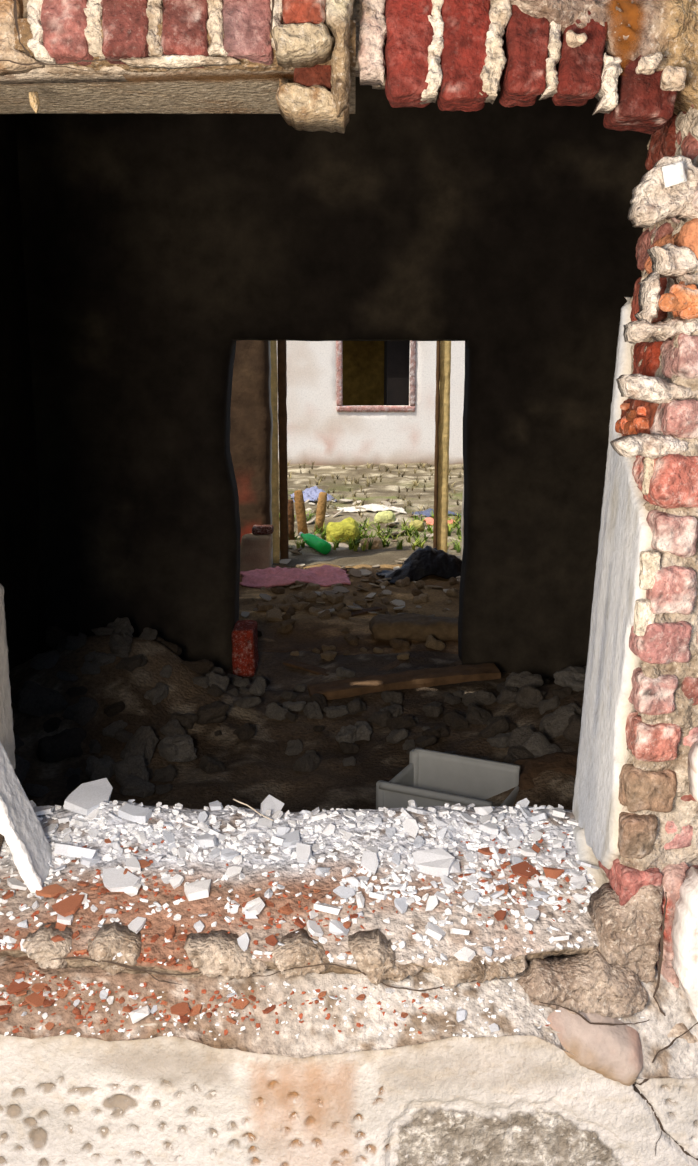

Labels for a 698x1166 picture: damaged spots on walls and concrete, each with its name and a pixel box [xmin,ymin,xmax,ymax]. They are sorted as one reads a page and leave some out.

spalling [658,284,698,320]
flaking render [0,296,698,1086]
crack [540,892,698,1160]